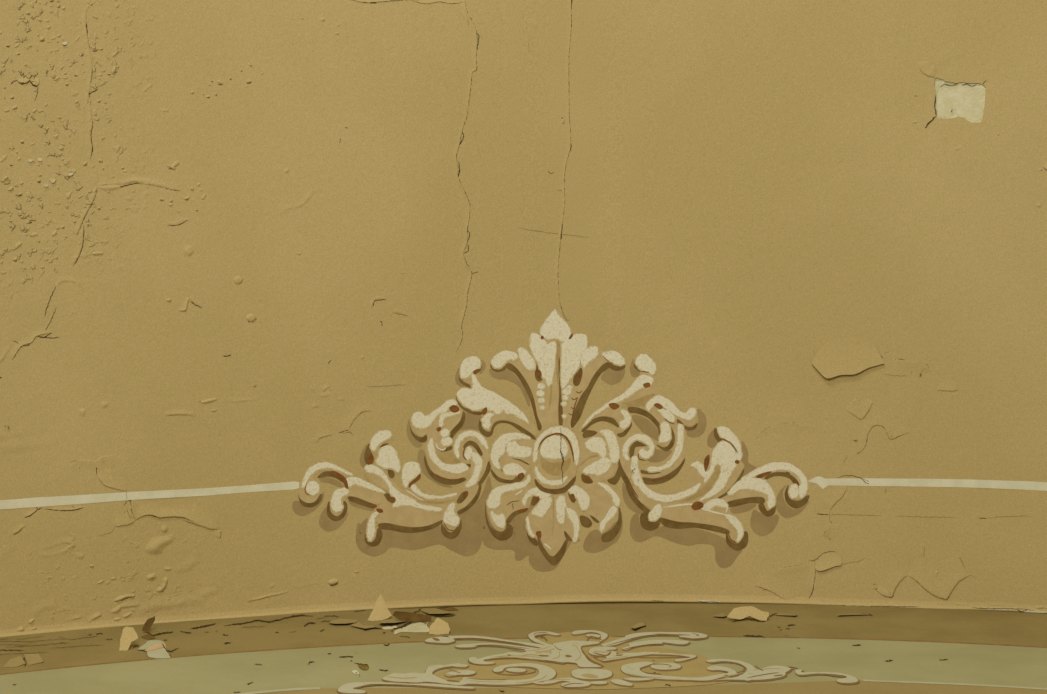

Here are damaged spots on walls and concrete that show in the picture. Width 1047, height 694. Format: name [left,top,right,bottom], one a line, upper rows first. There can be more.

crack [354,0,463,8]
flaking render [917,37,986,128]
crack [522,0,581,321]
crack [6,175,179,360]
crack [804,551,865,598]
flaking render [119,616,177,659]
peeling [304,594,458,645]